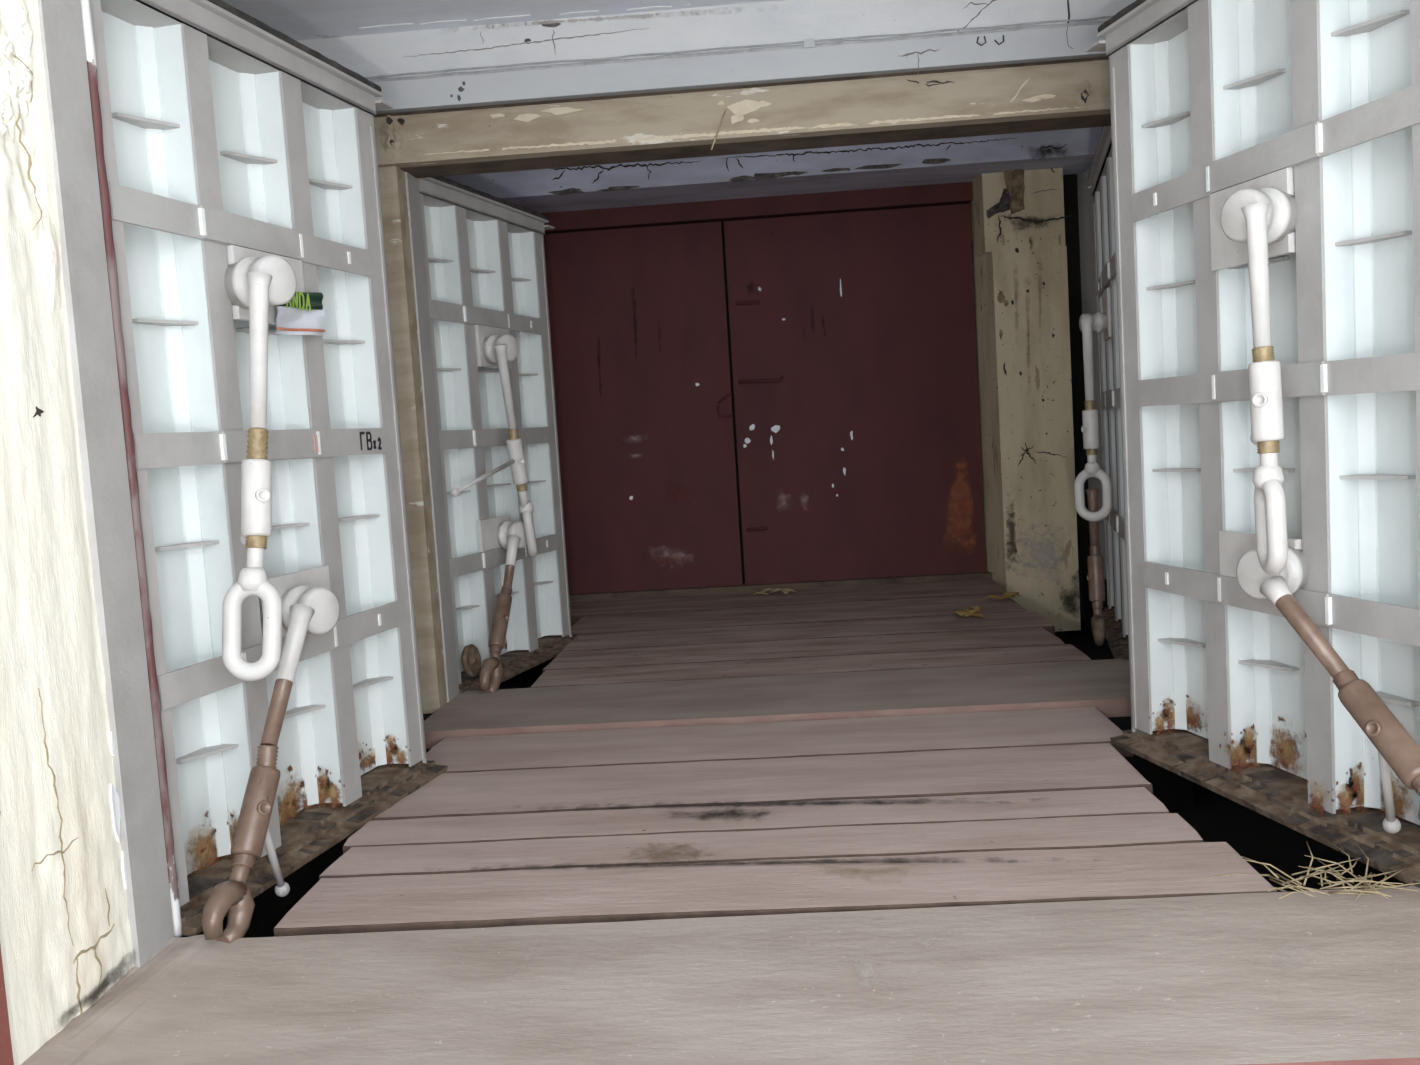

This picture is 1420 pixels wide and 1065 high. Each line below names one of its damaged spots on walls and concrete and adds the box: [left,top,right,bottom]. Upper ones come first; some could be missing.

crack [13,54,42,230]
peeling [490,107,584,122]
peeling [717,99,772,124]
crack [405,0,1085,242]
peeling [1022,94,1056,102]
peeling [743,424,780,460]
crack [1018,442,1066,466]
rust [1149,695,1201,736]
rust [278,765,345,826]
rust [1219,717,1411,819]
crack [31,688,114,1014]
rust [188,811,239,873]